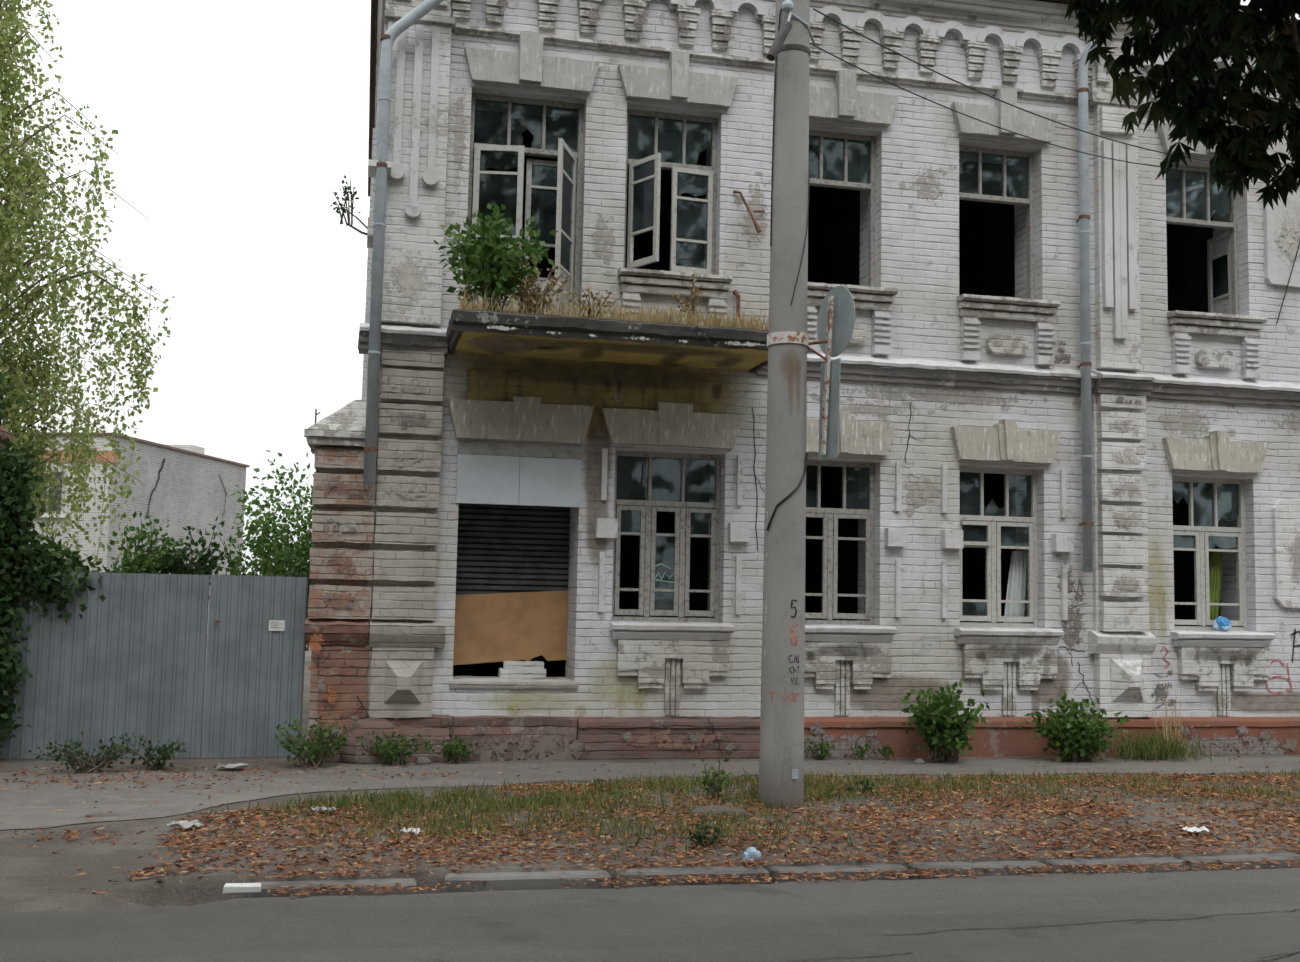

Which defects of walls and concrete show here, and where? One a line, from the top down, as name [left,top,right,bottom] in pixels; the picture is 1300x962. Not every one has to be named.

crack [146,458,166,515]
spalling [319,683,360,737]